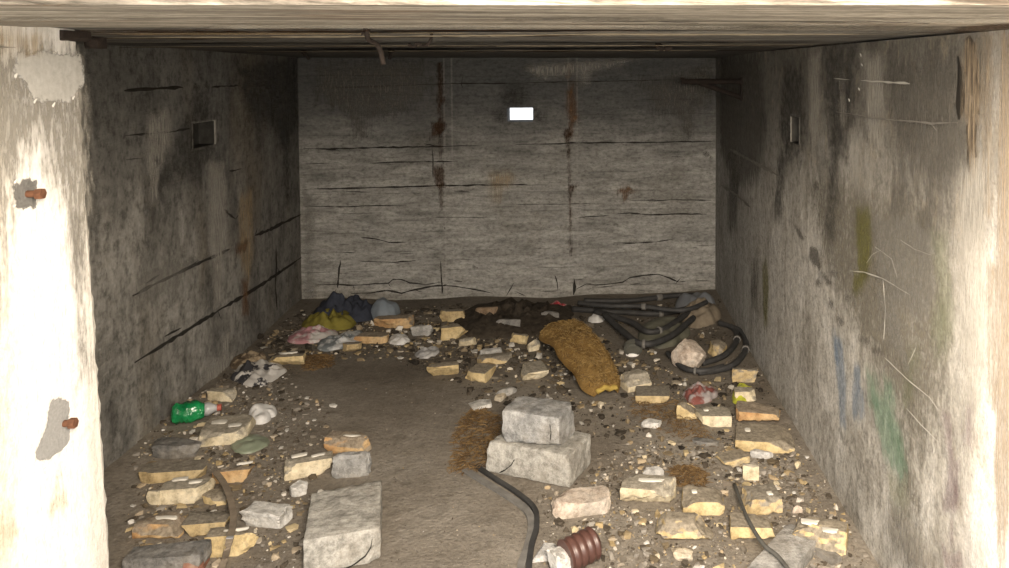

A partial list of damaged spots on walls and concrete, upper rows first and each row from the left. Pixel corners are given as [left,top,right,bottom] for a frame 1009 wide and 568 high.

leakage [0,46,90,287]
peeling [13,50,84,107]
rust [431,63,445,205]
crack [515,141,712,157]
crack [132,144,750,364]
spalling [32,398,70,475]